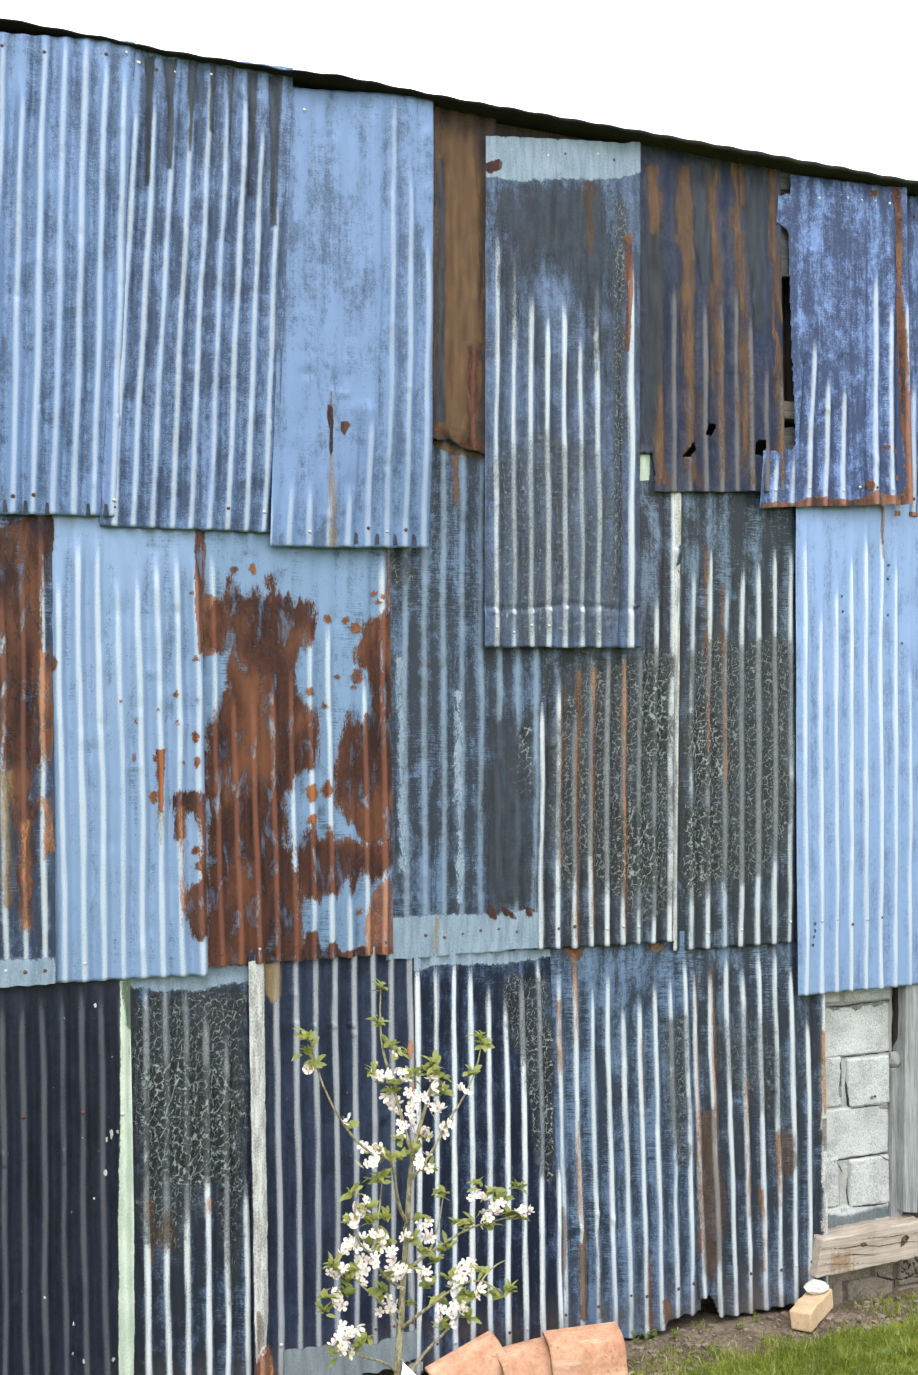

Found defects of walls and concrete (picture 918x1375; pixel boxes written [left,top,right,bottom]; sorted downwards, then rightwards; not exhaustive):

corrosion [433,124,502,507]
corrosion [624,159,785,487]
corrosion [762,186,918,544]
corrosion [0,514,58,933]
corrosion [149,530,393,967]